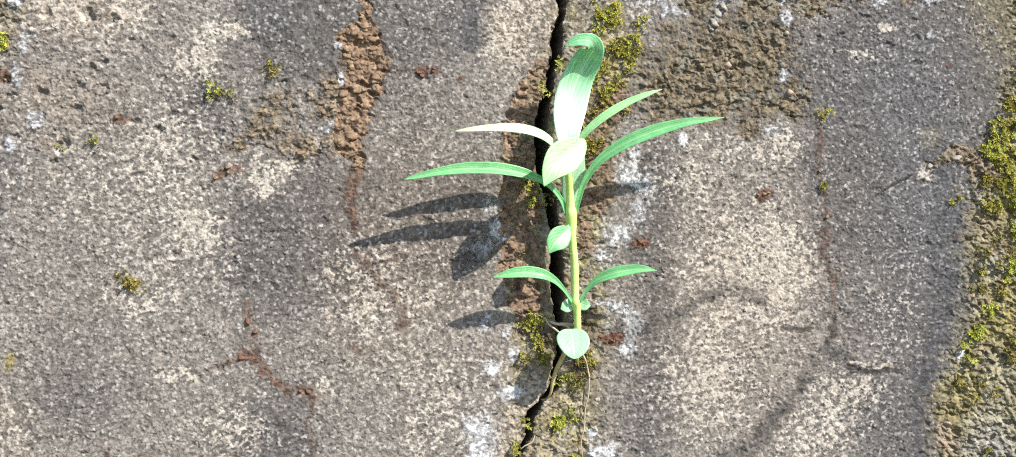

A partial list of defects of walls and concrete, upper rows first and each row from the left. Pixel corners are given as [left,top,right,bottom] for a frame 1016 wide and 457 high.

rust [344,163,366,232]
crack [512,0,568,457]
rust [354,250,410,330]
rust [207,302,316,411]